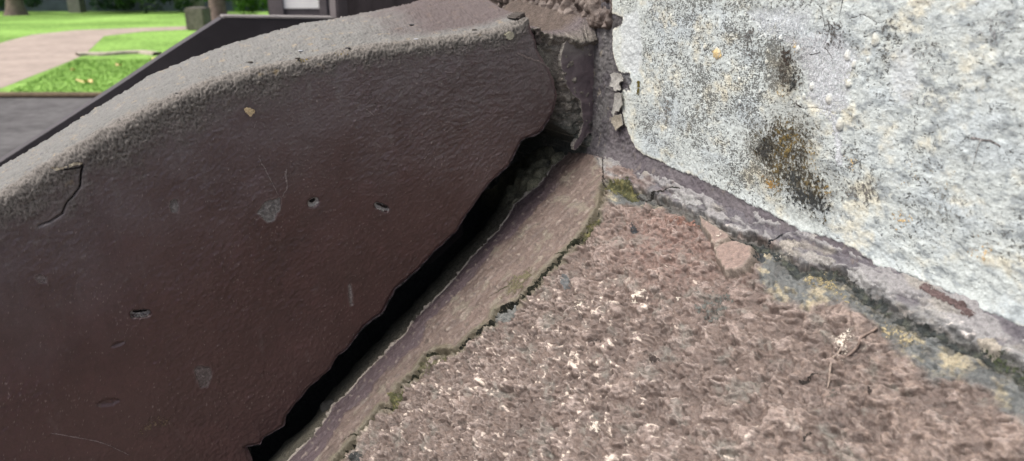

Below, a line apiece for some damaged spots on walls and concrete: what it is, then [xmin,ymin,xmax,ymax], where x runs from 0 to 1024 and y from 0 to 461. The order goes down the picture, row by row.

crack [40,164,83,225]
peeling [257,197,281,222]
spalling [485,0,598,190]
peeling [609,72,631,131]
water stain [746,40,883,225]
crack [250,146,607,461]